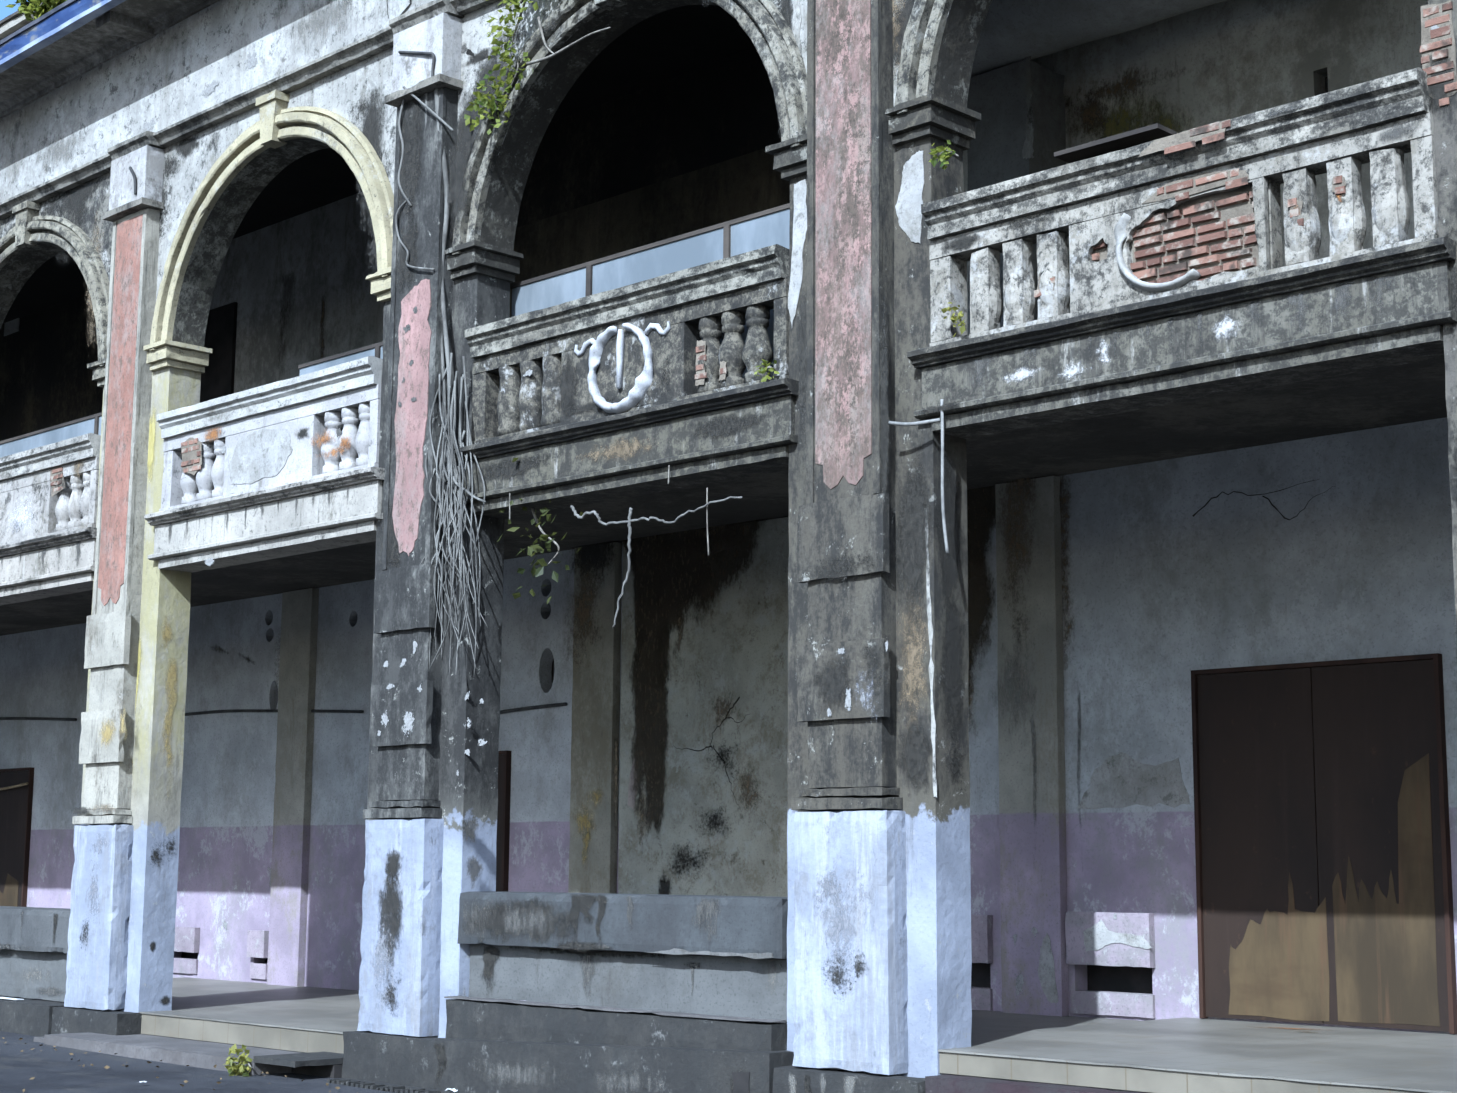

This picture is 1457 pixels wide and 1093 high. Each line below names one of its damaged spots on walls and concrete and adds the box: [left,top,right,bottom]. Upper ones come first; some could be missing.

spalling [1420,0,1457,110]
spalling [1139,119,1231,157]
peeling [895,151,924,244]
spalling [1130,168,1269,283]
spalling [1287,198,1304,226]
damp [1287,293,1307,327]
damp [797,289,807,446]
damp [816,304,1036,790]
crack [1192,479,1336,520]
damp [565,519,763,842]
crack [673,694,749,810]